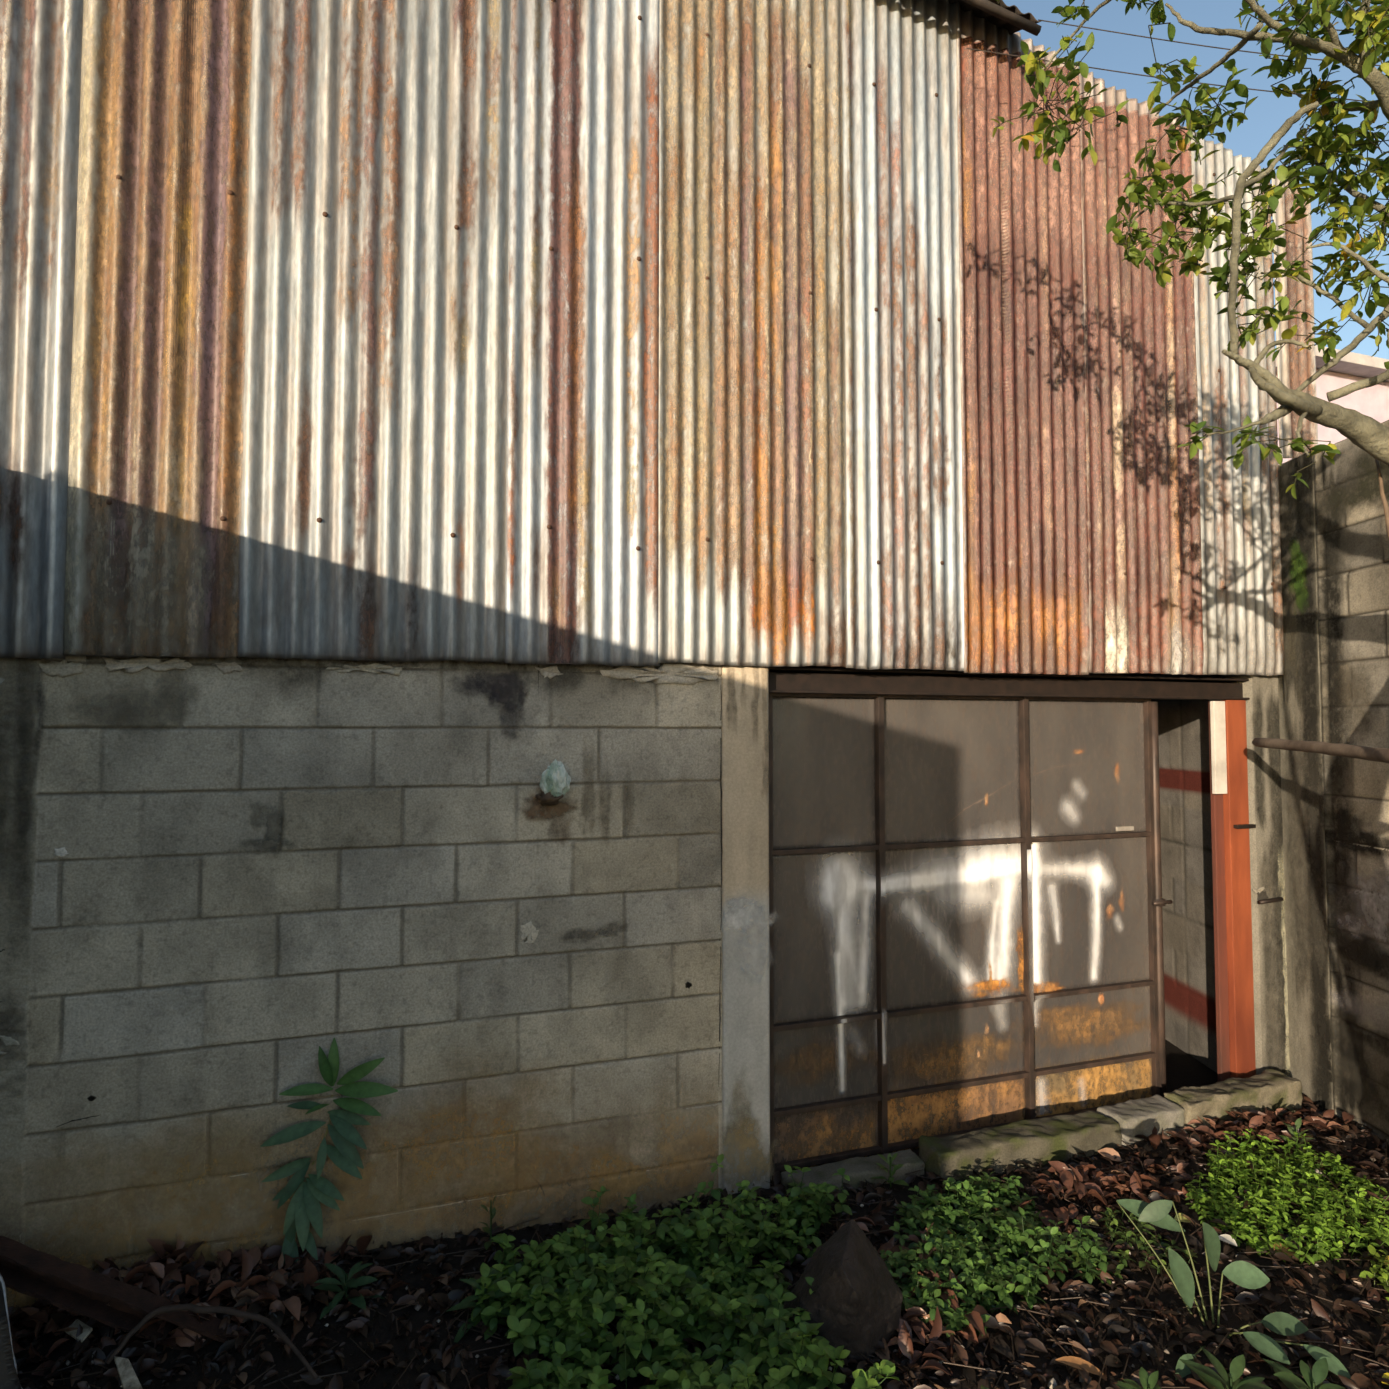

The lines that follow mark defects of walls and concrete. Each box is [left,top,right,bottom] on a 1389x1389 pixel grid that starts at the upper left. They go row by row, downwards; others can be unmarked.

corrosion [65,0,252,657]
leakage [168,657,428,684]
corrosion [298,412,311,531]
corrosion [339,0,402,538]
leakage [449,660,529,721]
corrosion [532,0,592,663]
leakage [547,663,691,687]
corrosion [624,0,856,666]
corrosion [876,35,1315,675]
leakage [1254,452,1389,1141]
leakage [23,1106,771,1281]
corrosion [774,1026,1152,1172]